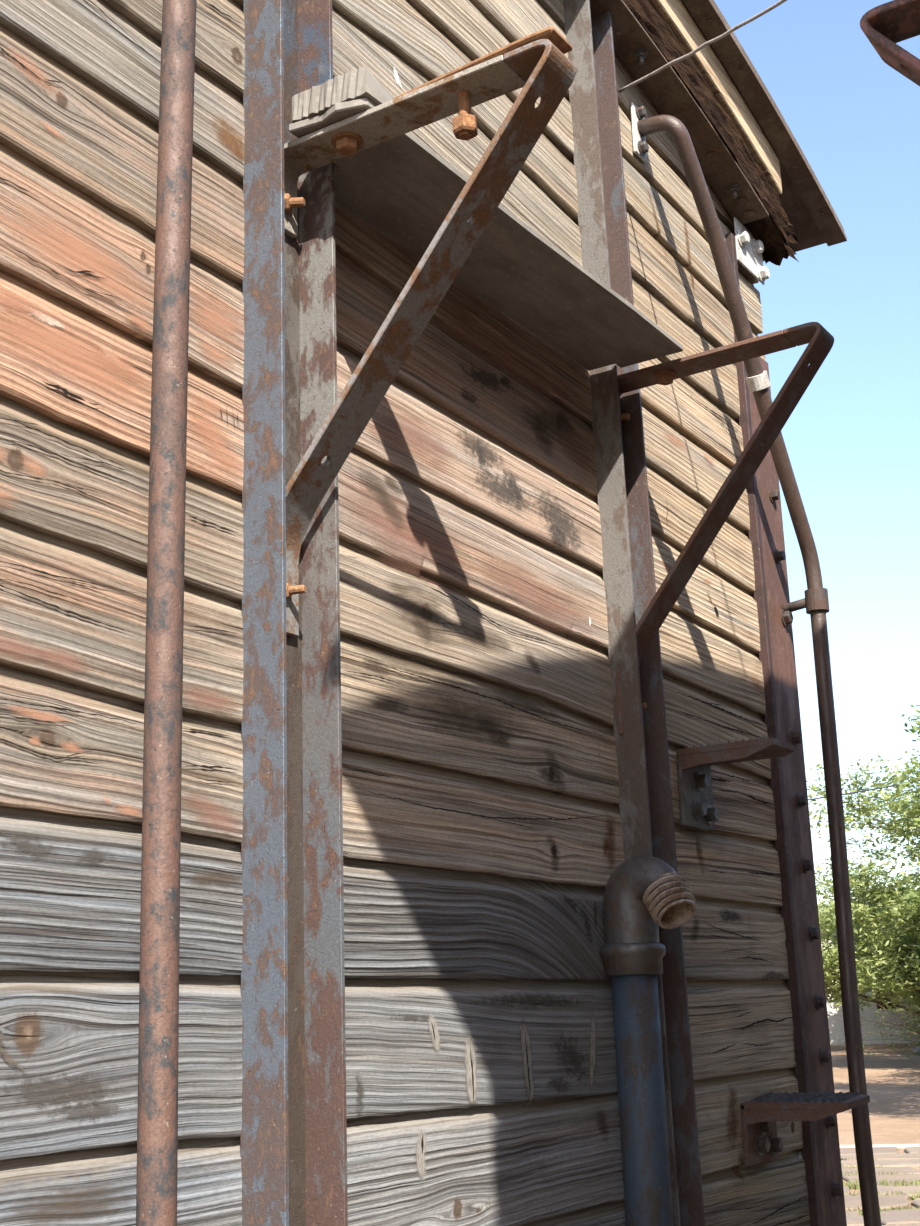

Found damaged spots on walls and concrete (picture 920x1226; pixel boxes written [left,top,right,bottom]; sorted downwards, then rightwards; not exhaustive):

corrosion [220,121,242,158]
water stain [458,432,581,548]